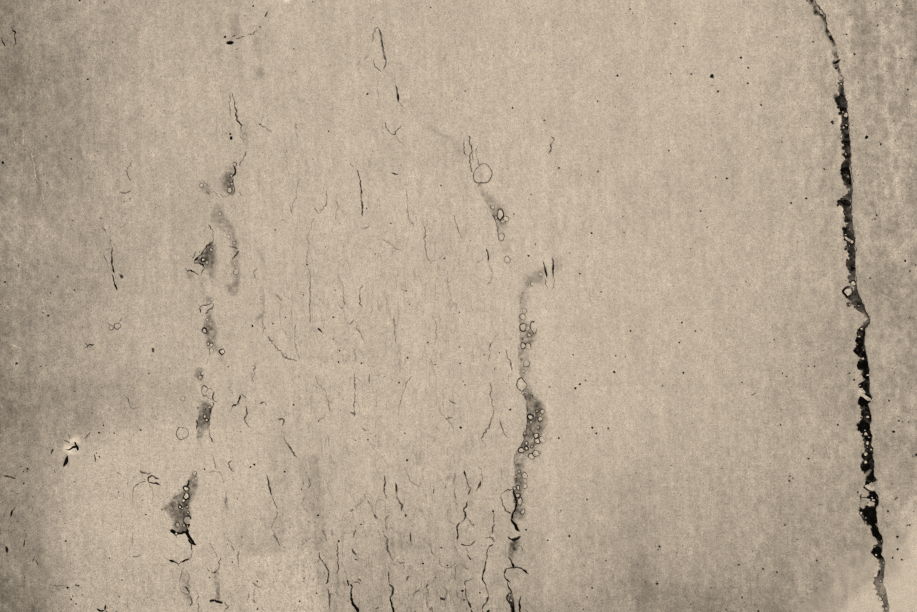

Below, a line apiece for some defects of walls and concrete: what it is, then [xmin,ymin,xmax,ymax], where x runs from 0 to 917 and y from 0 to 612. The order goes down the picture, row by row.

leakage [161,469,201,565]
leakage [191,161,267,450]
leakage [482,194,512,264]
leakage [499,252,565,540]
crack [805,0,890,612]